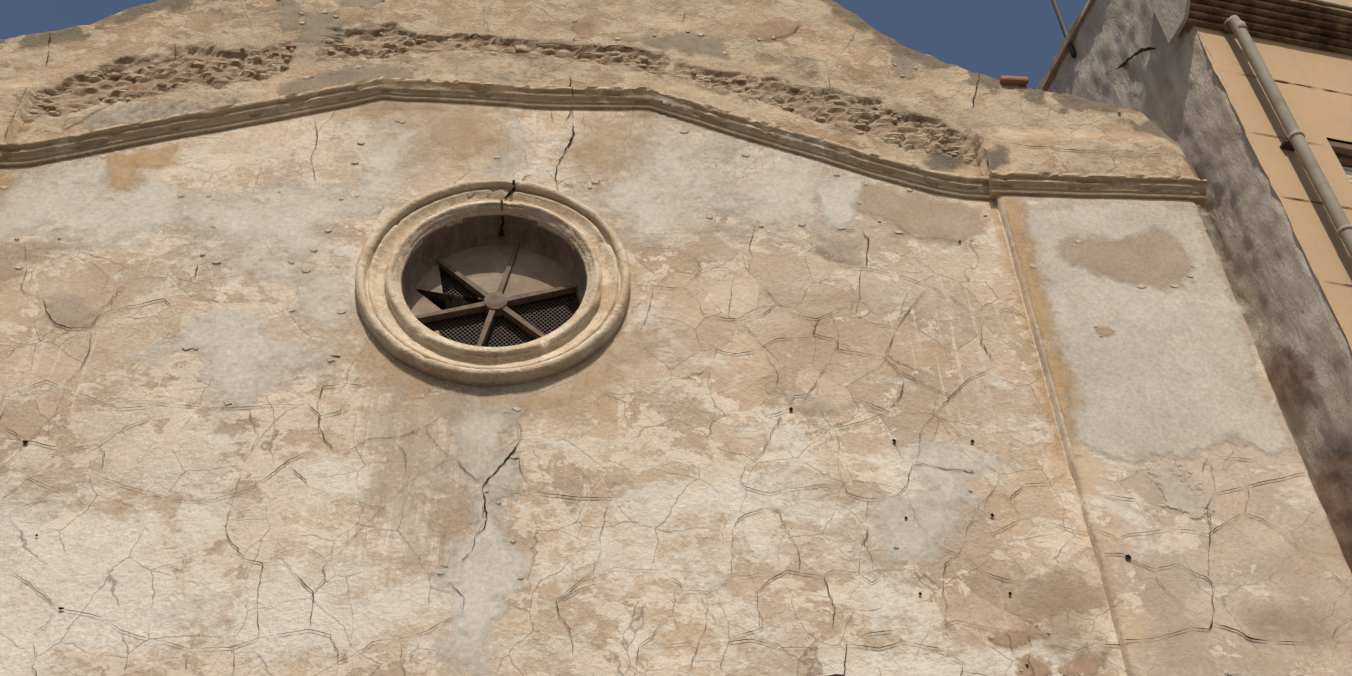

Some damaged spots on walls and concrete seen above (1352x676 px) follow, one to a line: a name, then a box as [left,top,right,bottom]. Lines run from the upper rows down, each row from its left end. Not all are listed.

peeling [0,119,429,330]
spalling [7,0,984,165]
crack [498,77,575,236]
crack [589,44,649,52]
peeling [569,100,868,242]
crack [1115,47,1156,70]
crack [0,223,1351,676]